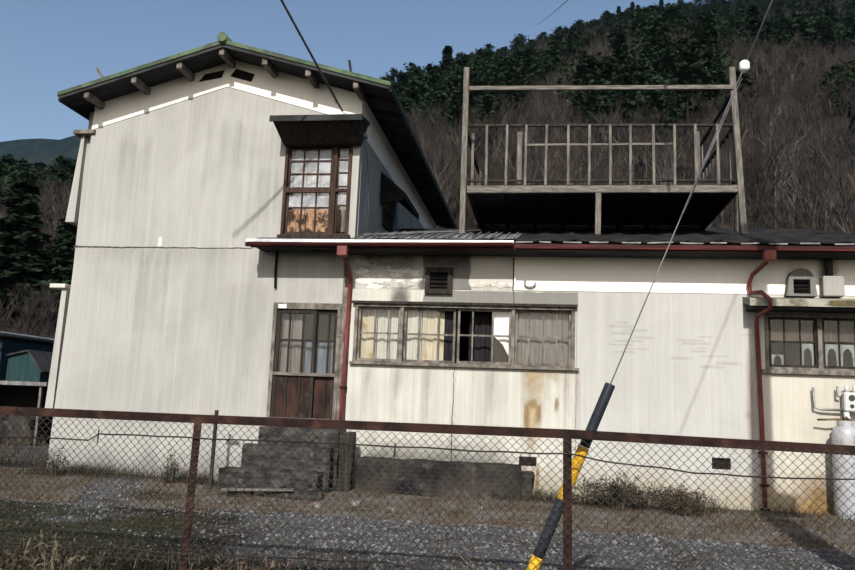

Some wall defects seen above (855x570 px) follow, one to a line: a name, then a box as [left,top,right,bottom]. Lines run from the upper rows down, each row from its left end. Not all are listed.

peeling [354,255,422,289]
rust [525,401,541,439]